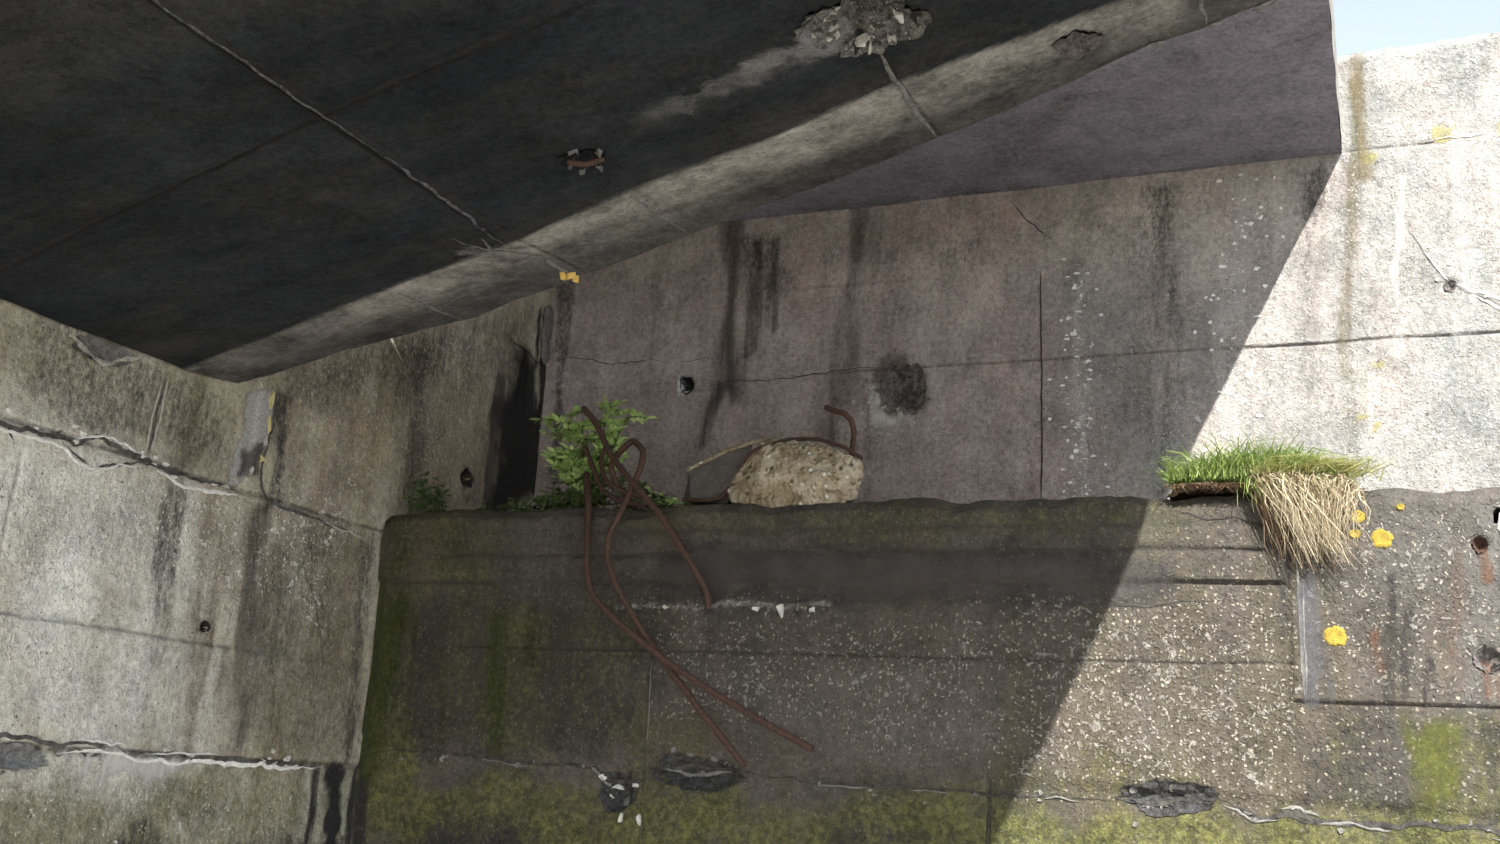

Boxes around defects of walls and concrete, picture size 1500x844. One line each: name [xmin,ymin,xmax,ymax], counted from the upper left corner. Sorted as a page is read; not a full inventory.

spalling [739,0,933,85]
crack [145,0,579,283]
crack [1408,230,1500,310]
damp [700,221,778,447]
crack [0,374,365,540]
damp [483,347,546,511]
spalling [852,348,930,436]
spalling [0,742,61,775]
crack [0,732,321,771]
spalling [598,747,745,826]
spalling [1115,778,1219,828]
crack [1207,789,1500,841]